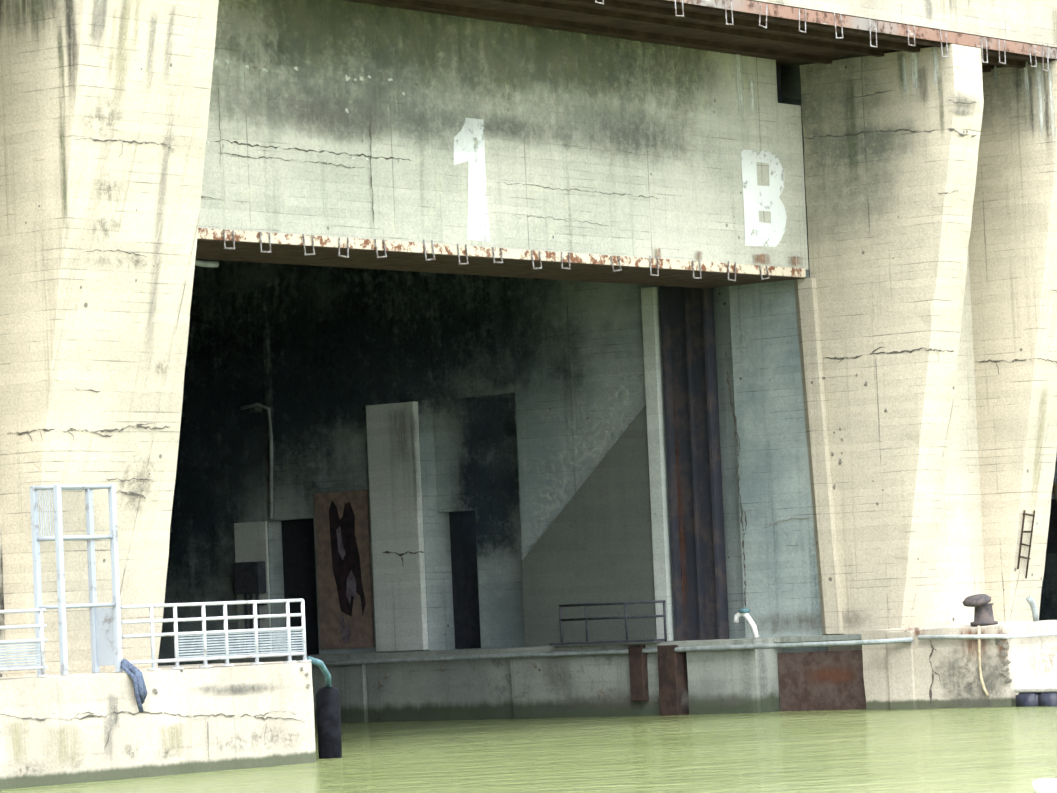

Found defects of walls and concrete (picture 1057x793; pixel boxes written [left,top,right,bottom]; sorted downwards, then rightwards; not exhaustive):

damp [58,3,75,76]
crack [215,89,411,221]
crack [823,347,1057,374]
crack [12,423,171,442]
rust [777,650,866,711]